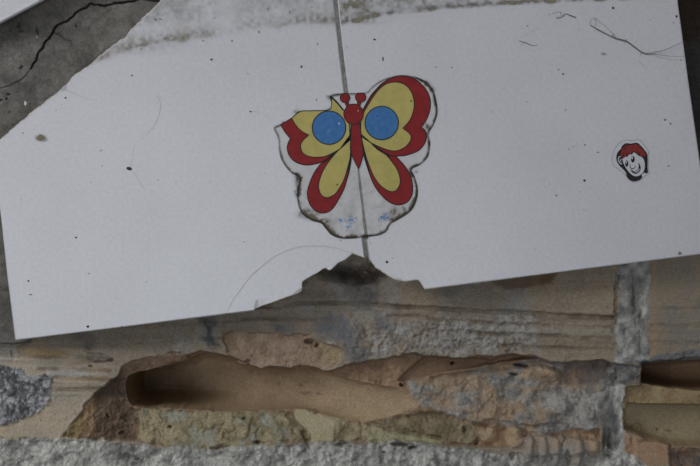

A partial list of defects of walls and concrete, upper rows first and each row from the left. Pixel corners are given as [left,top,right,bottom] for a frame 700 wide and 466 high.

crack [0,0,160,90]
spalling [61,329,700,466]